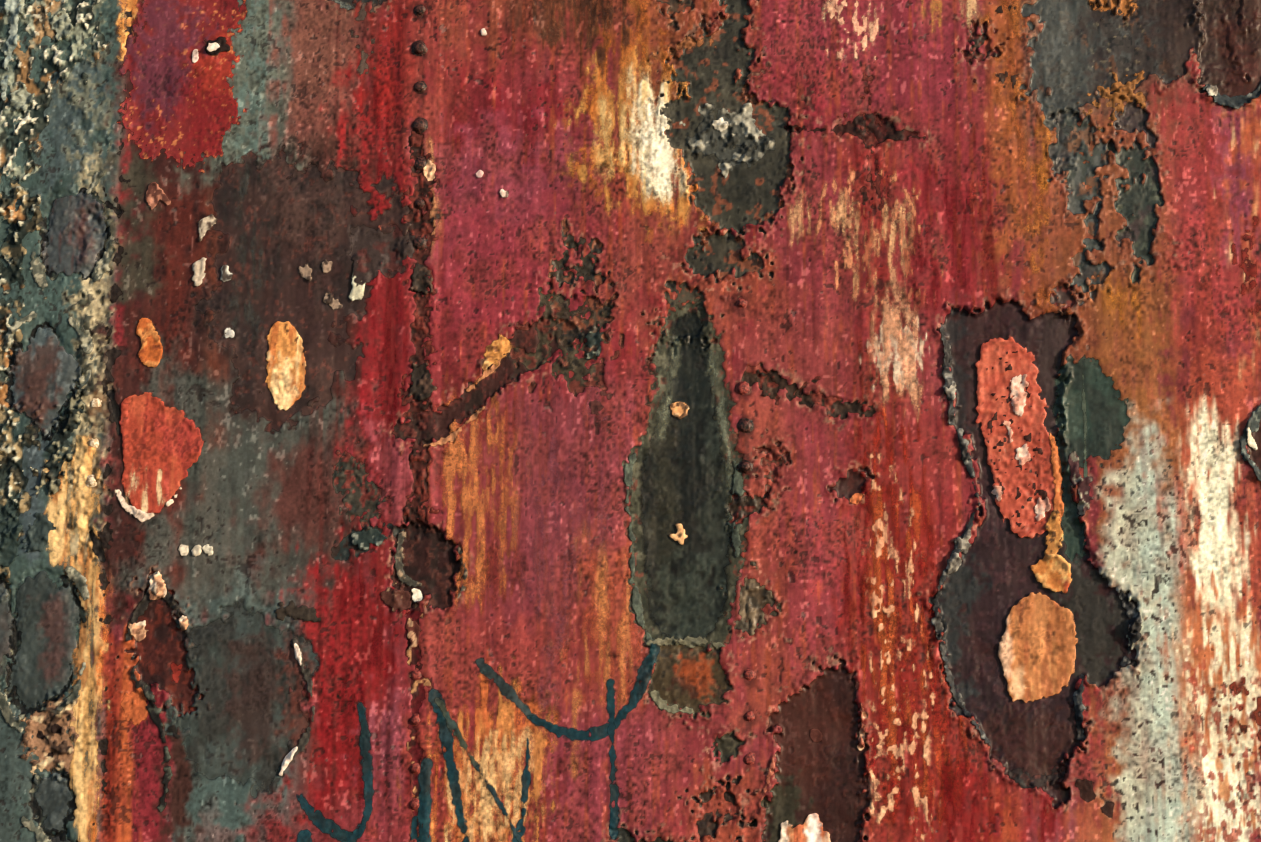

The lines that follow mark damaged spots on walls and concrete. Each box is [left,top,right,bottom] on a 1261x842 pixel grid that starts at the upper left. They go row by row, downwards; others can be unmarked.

peeling [0,0,110,592]
corrosion [1216,215,1261,313]
peeling [600,0,1261,842]
peeling [20,694,79,776]
corrosion [1225,677,1261,760]